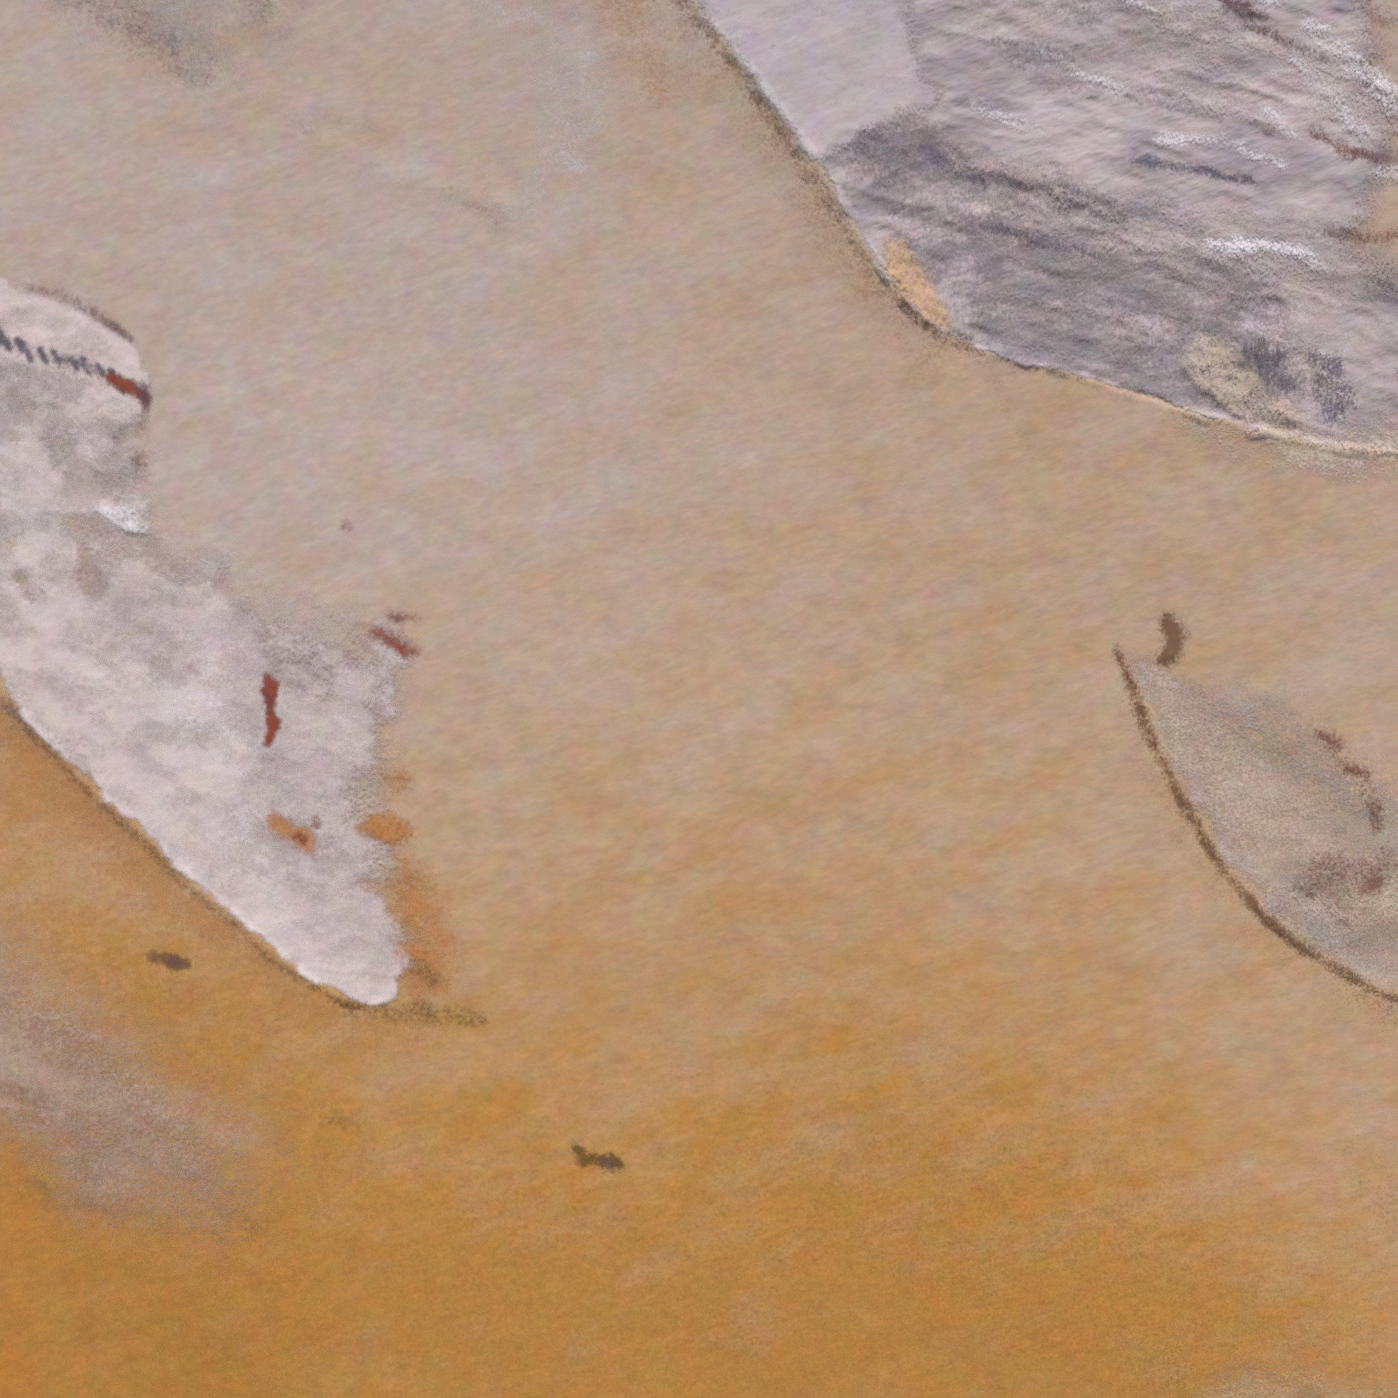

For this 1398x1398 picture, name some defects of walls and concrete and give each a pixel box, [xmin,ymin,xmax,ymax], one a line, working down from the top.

spalling [671,0,1398,484]
spalling [0,276,487,1056]
corrosion [260,672,282,748]
corrosion [367,611,423,658]
peeling [1133,610,1398,990]